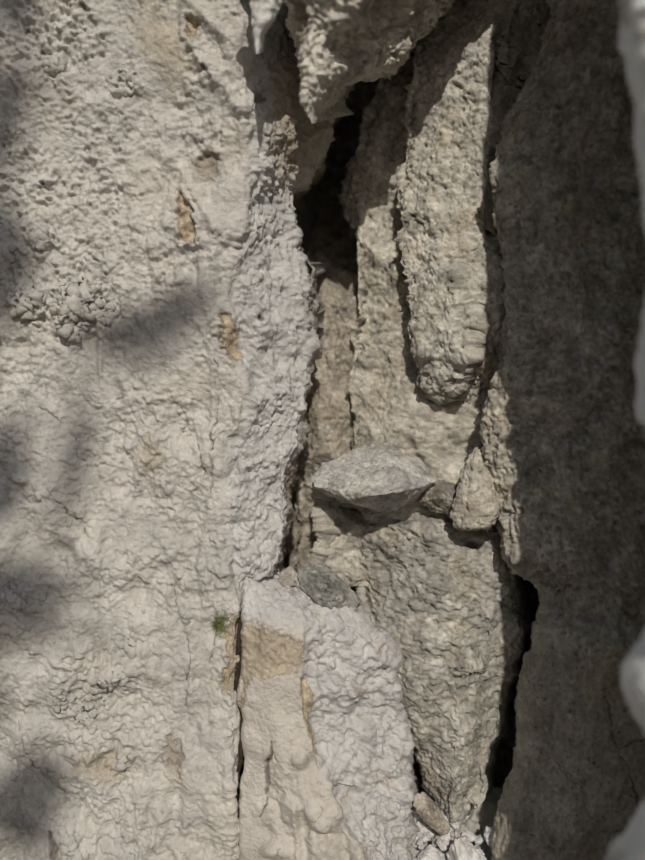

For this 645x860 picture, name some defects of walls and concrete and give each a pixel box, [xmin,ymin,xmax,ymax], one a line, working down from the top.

spalling [175,194,196,244]
spalling [218,310,243,361]
crack [234,605,243,818]